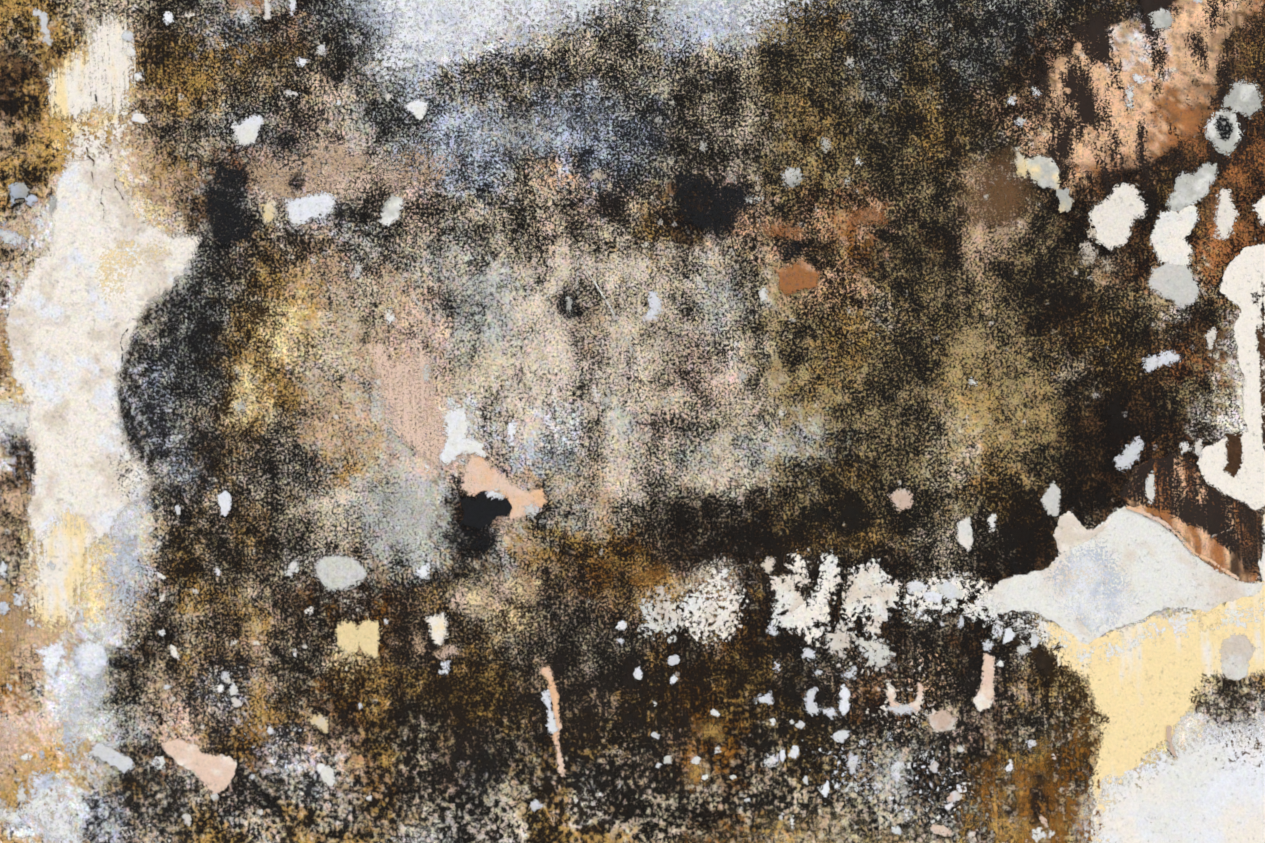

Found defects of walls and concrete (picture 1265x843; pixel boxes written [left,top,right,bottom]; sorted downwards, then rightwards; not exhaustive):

leakage [0,0,62,259]
spalling [1006,0,1265,310]
peeling [364,342,548,530]
leakage [449,360,527,474]
peeling [753,244,1265,753]
leakage [0,436,37,686]
leakage [1043,537,1142,637]
leakage [35,641,67,683]
peeling [780,745,799,763]
peeling [803,776,830,797]
peeling [945,791,961,810]
leakage [1189,670,1265,779]